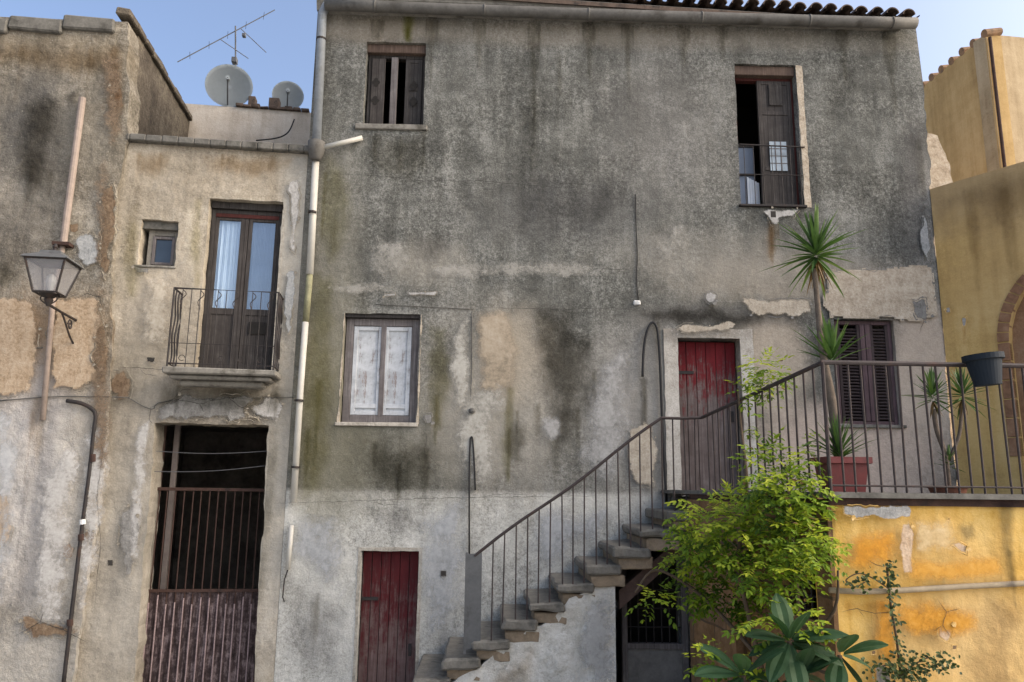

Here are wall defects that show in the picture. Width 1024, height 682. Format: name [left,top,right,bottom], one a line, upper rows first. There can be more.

peeling [286,181,301,255]
peeling [744,215,968,327]
peeling [0,164,133,468]
peeling [156,391,285,424]
leakage [544,419,559,438]
peeling [630,421,658,488]
peeling [842,504,915,572]